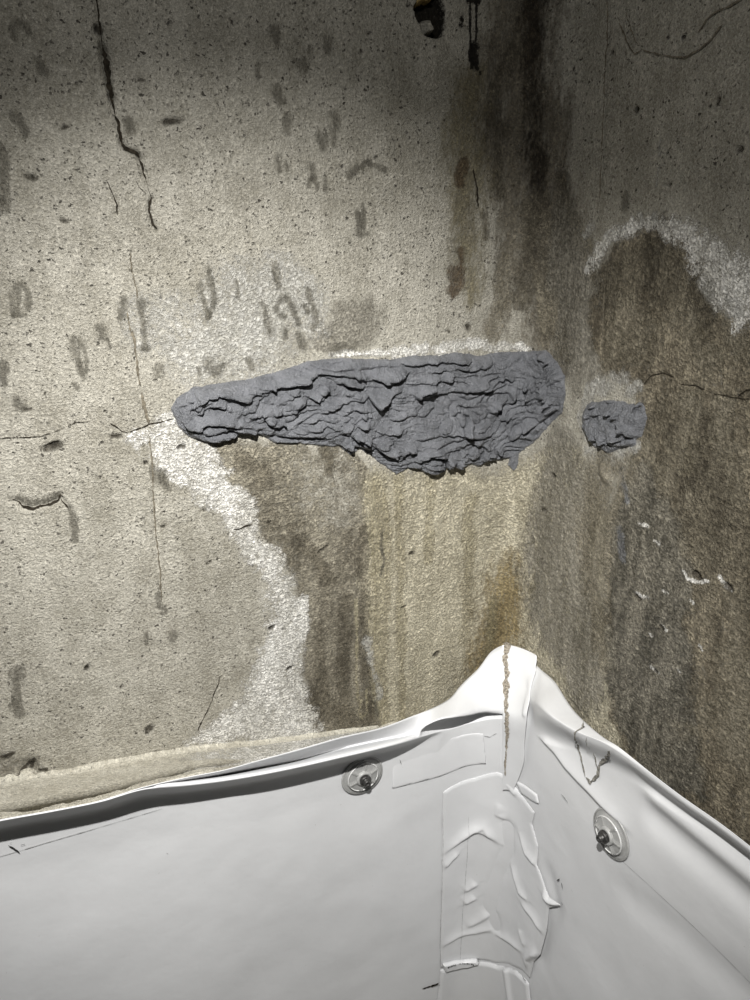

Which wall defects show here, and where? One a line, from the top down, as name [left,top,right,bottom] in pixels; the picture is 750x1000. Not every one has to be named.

crack [96,0,157,230]
water stain [121,0,750,845]